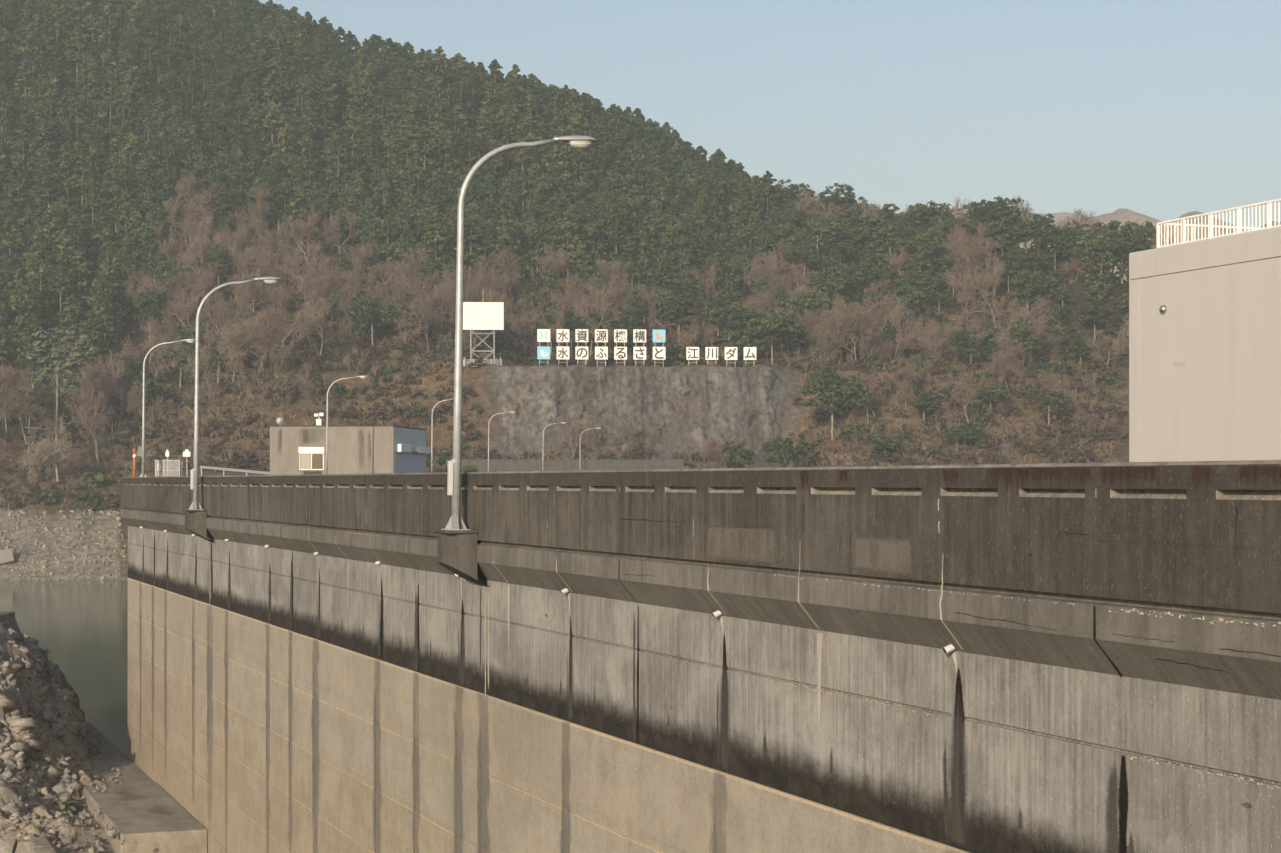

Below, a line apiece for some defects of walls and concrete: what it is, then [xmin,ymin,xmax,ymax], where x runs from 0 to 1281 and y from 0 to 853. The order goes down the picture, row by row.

corrosion [987,466,1156,491]
corrosion [1237,466,1281,484]
damp [1093,606,1122,677]
damp [128,518,1088,853]
damp [1106,756,1134,853]